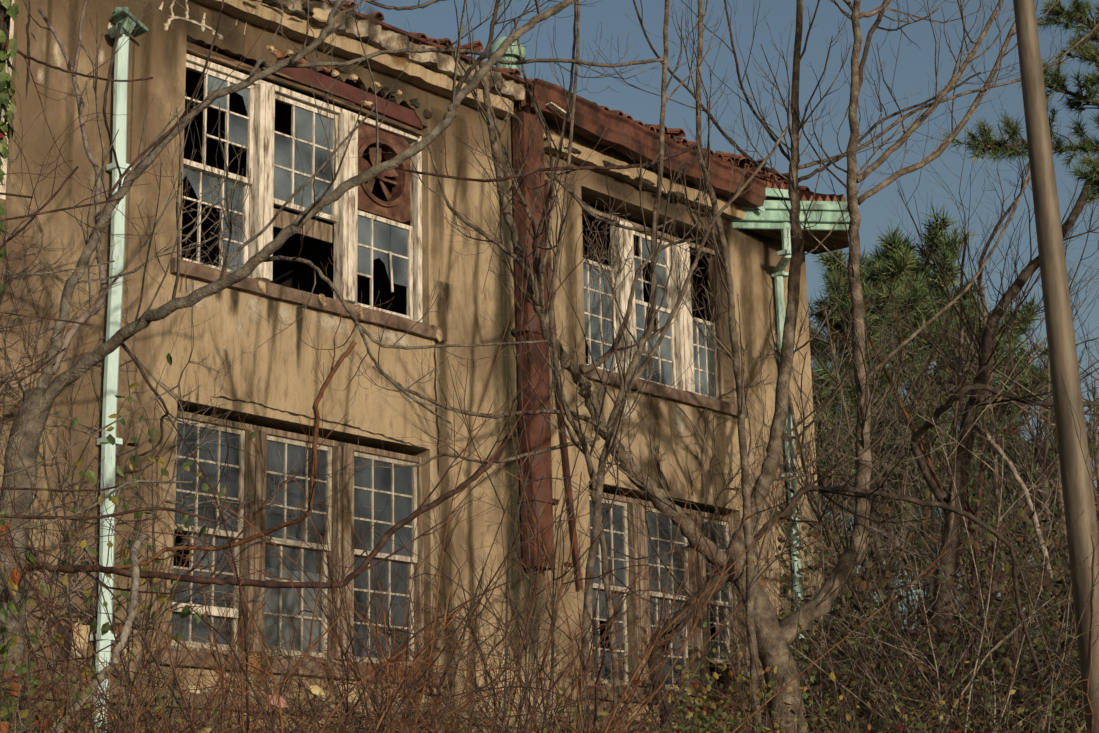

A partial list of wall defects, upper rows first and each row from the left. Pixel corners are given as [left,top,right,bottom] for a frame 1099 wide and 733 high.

peeling [158,0,223,40]
spalling [257,0,328,22]
spalling [266,45,309,63]
spalling [321,66,358,81]
spalling [372,81,432,119]
damp [439,282,450,301]
damp [217,290,303,358]
damp [318,314,341,328]
damp [382,328,408,345]